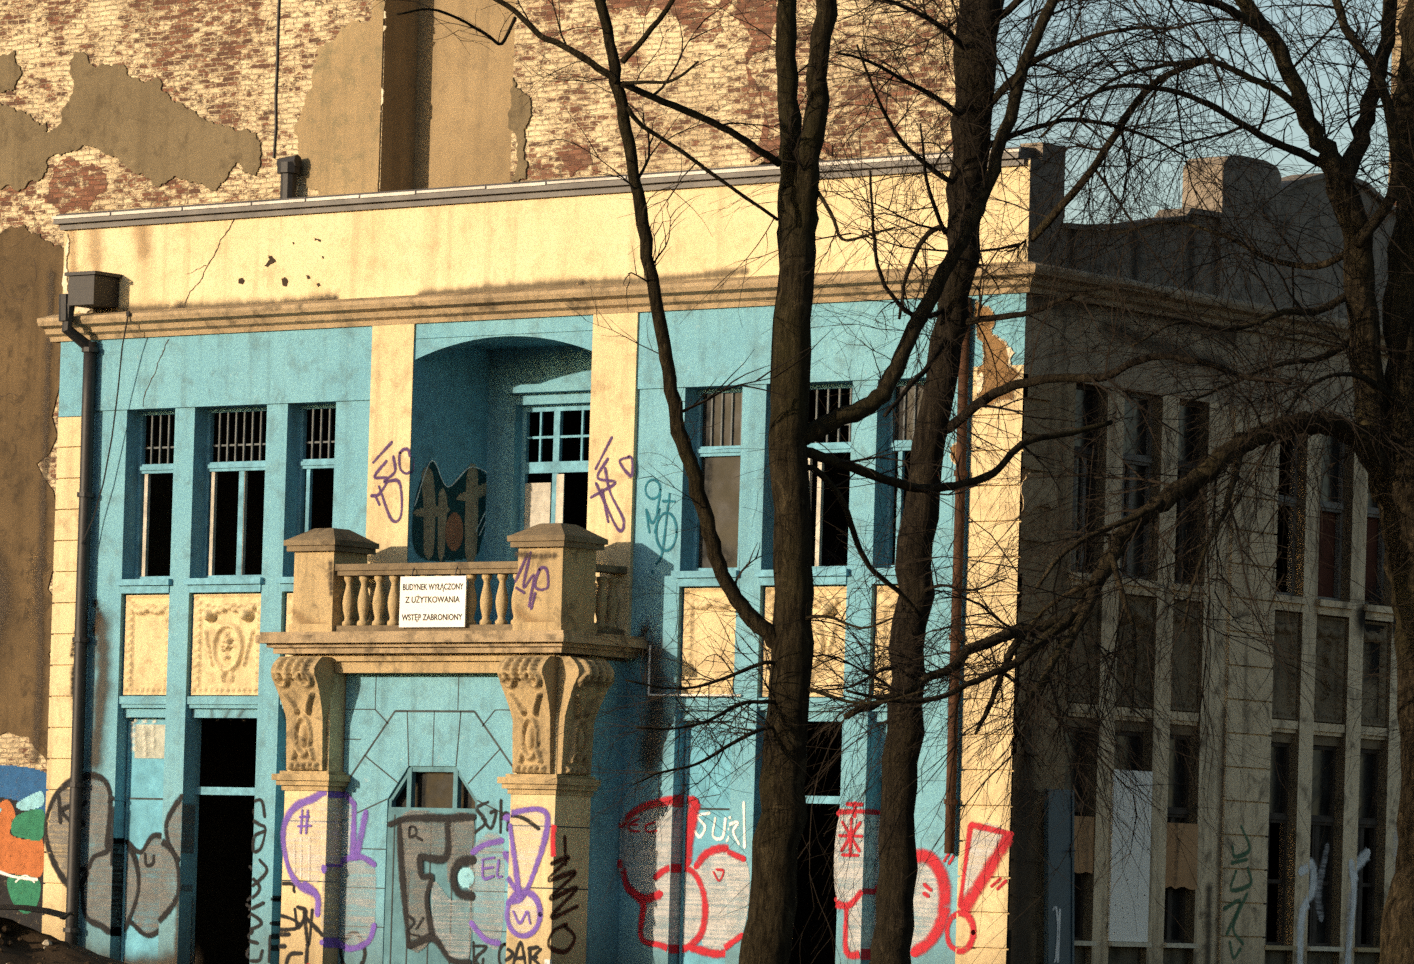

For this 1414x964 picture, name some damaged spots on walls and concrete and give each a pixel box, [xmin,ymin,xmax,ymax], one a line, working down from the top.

flaking render [44,156,107,214]
flaking render [562,144,593,177]
peeling [62,233,90,313]
crack [184,219,235,306]
spalling [974,300,1024,406]